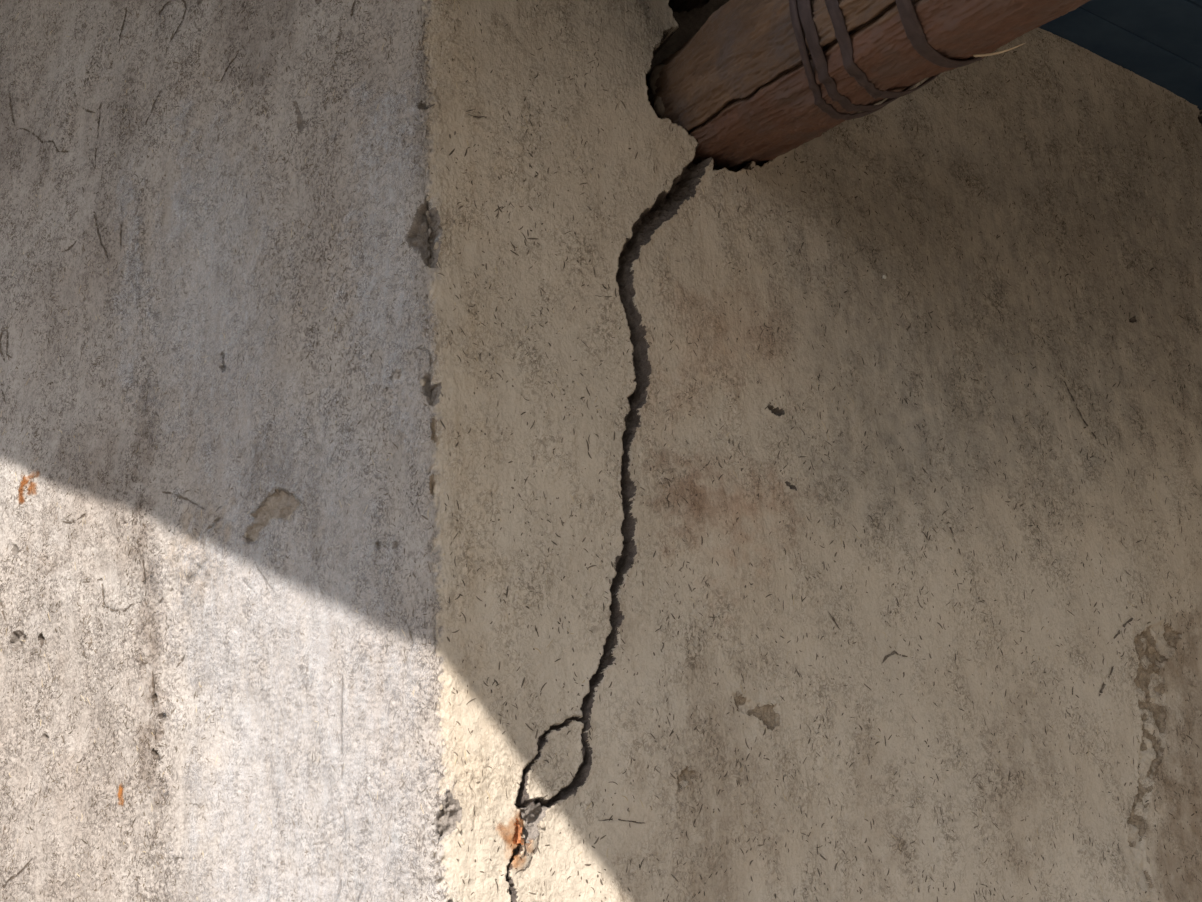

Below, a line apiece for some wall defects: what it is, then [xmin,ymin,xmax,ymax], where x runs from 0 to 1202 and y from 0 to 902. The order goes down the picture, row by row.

flaking render [405,198,443,268]
flaking render [242,488,302,544]
crack [506,144,713,902]
flaking render [1127,623,1182,848]